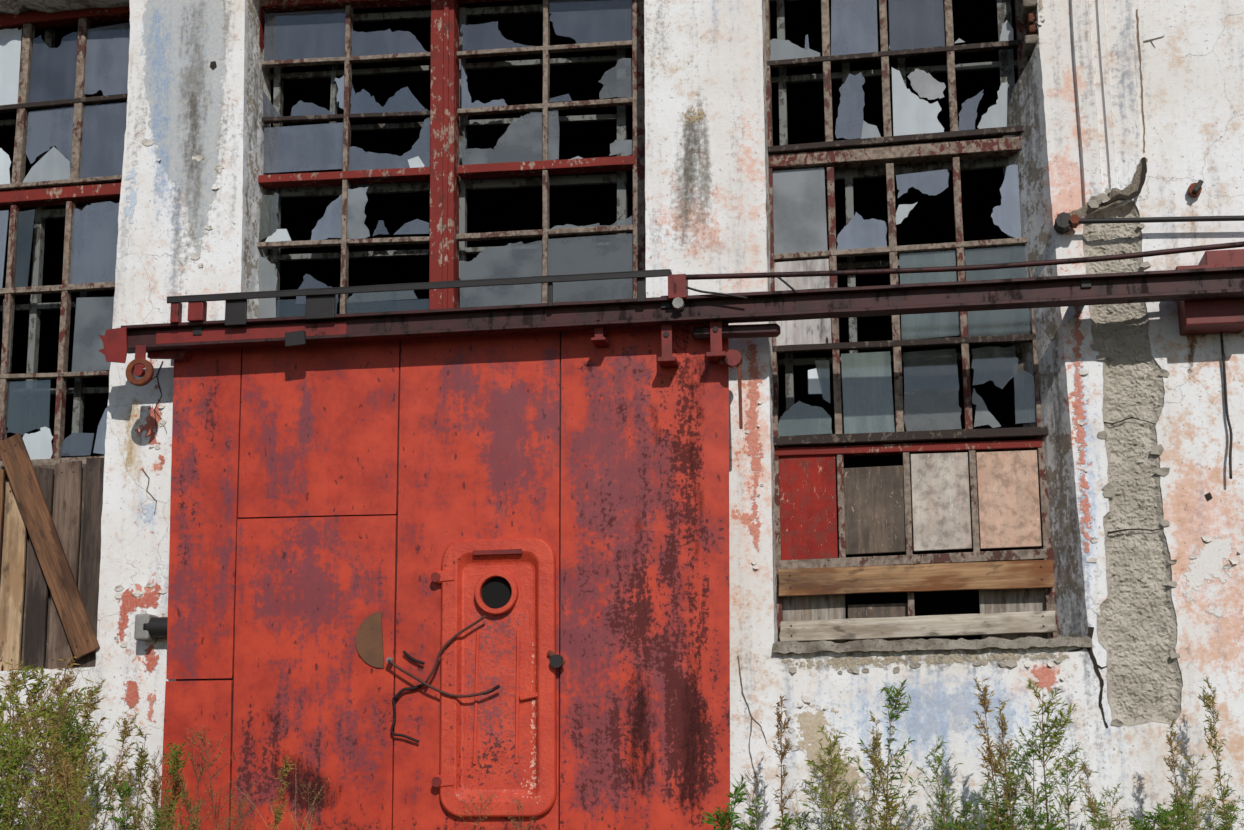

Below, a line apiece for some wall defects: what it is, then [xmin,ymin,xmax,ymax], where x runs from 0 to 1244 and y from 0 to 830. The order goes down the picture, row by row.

water stain [182,45,203,128]
water stain [682,106,706,182]
spalling [1068,156,1152,274]
peeling [743,344,764,569]
spalling [1068,302,1242,726]
peeling [114,582,167,647]
peeling [122,642,159,723]
rust [630,668,654,787]
crack [1068,627,1109,728]
rust [276,757,341,810]